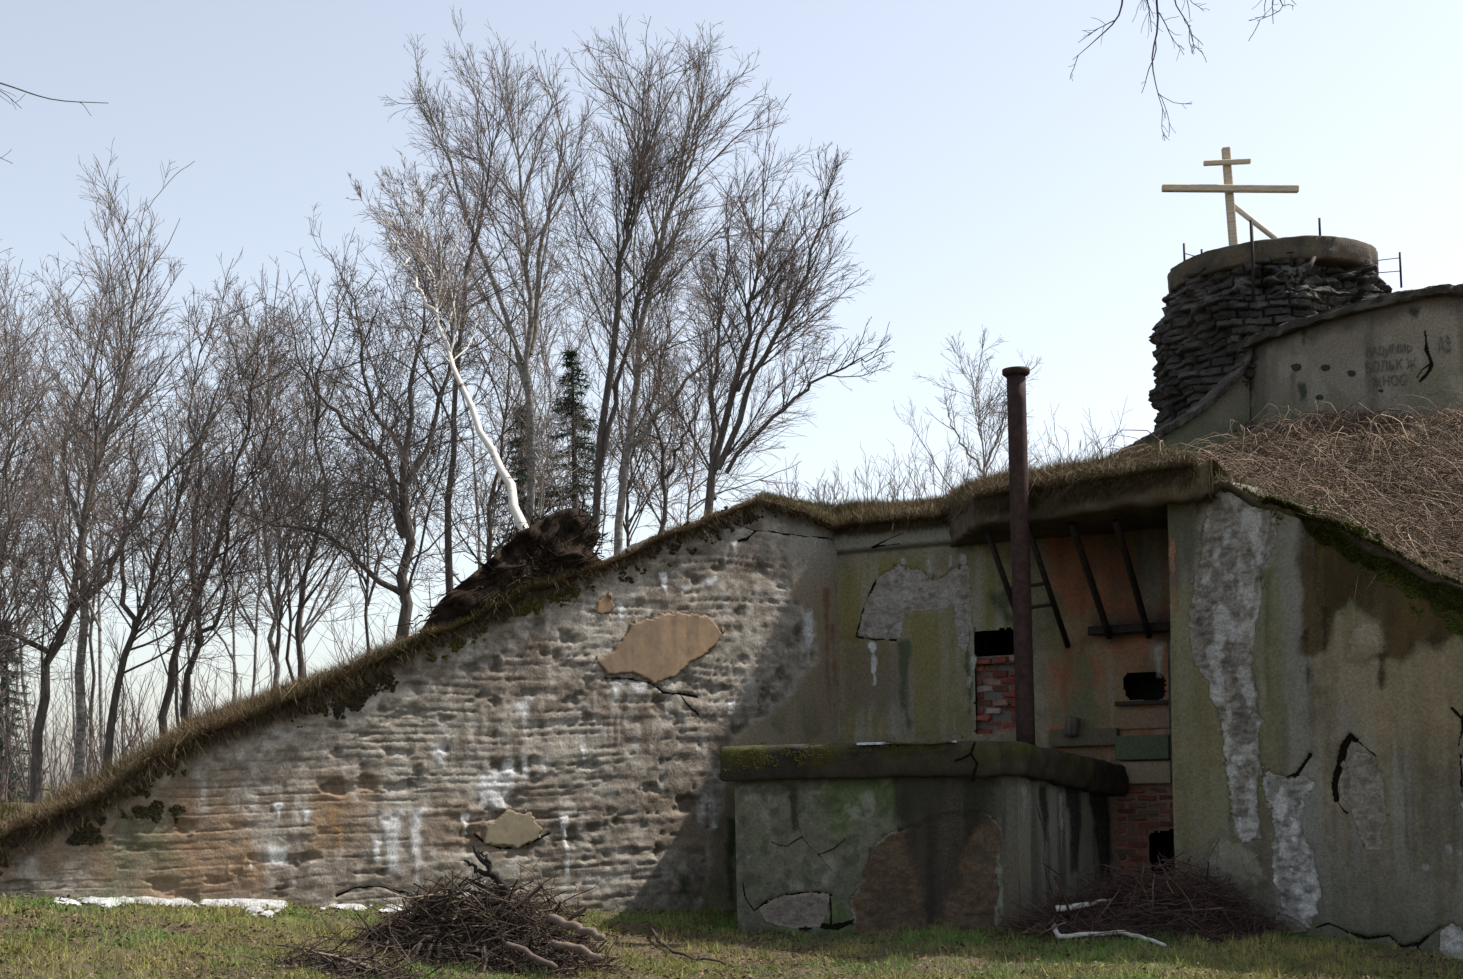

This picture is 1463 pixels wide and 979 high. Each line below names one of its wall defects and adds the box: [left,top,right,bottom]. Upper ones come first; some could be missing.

crack [1416,330,1433,382]
spalling [854,563,976,652]
leakage [1298,515,1463,687]
flaking render [596,611,725,686]
crack [604,677,699,715]
spalling [1188,478,1321,929]
leakage [372,808,426,883]
flaking render [483,809,543,849]
crack [742,812,854,932]
spalling [1339,752,1390,851]
spalling [759,891,830,933]
crack [1316,922,1442,952]